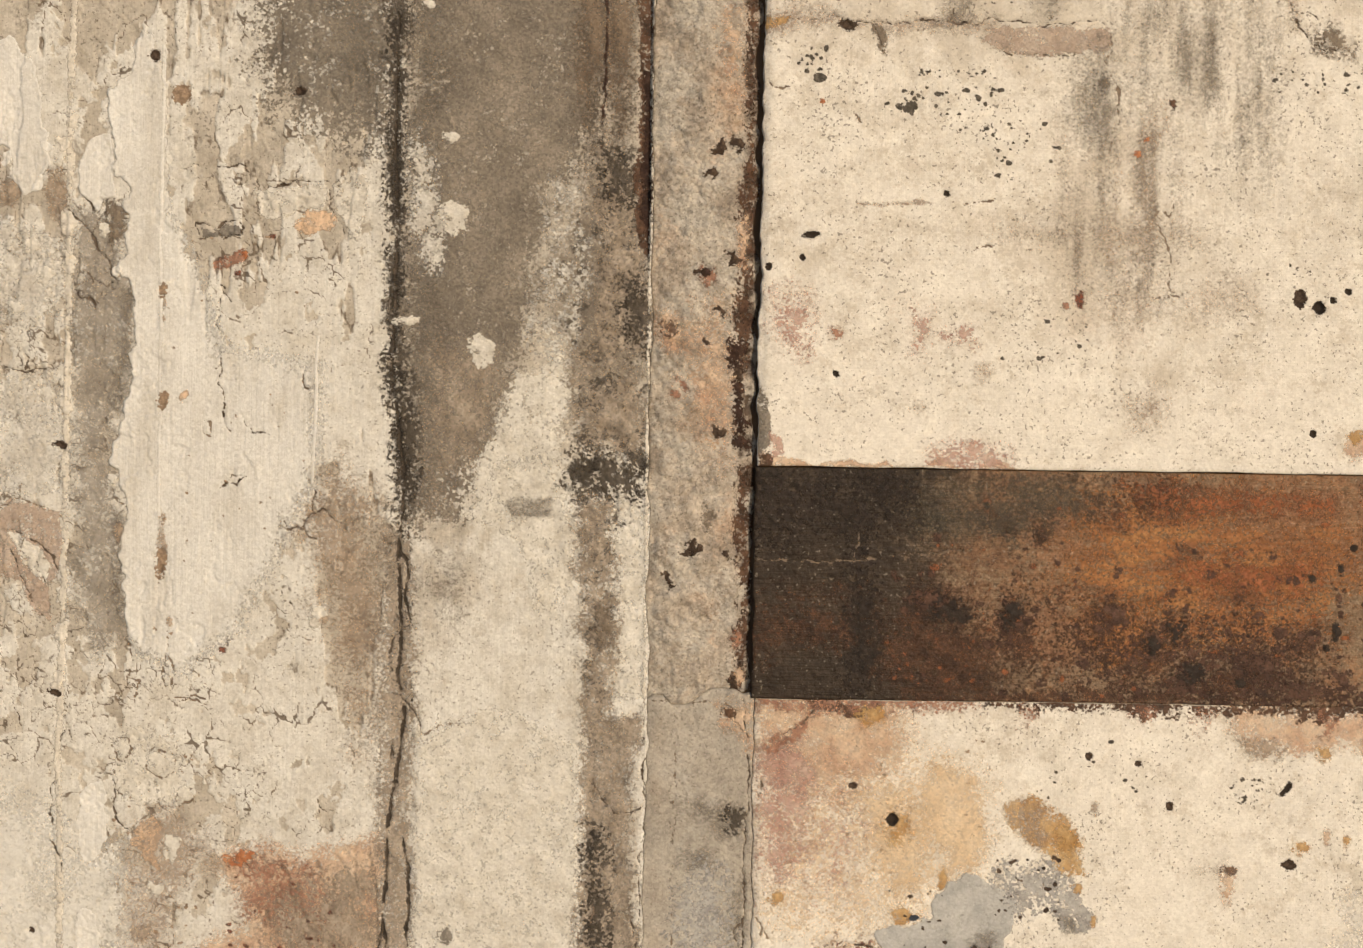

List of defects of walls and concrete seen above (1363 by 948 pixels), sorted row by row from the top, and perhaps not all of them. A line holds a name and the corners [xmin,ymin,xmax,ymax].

spalling [235,0,470,276]
damp [766,11,840,33]
damp [872,23,910,56]
rust [1311,22,1358,63]
peeling [0,29,385,720]
peeling [391,315,420,326]
crack [376,12,475,948]
damp [370,0,653,948]
rust [656,0,893,688]
rust [715,440,1363,928]
rust [109,812,390,948]
peeling [824,855,1093,948]